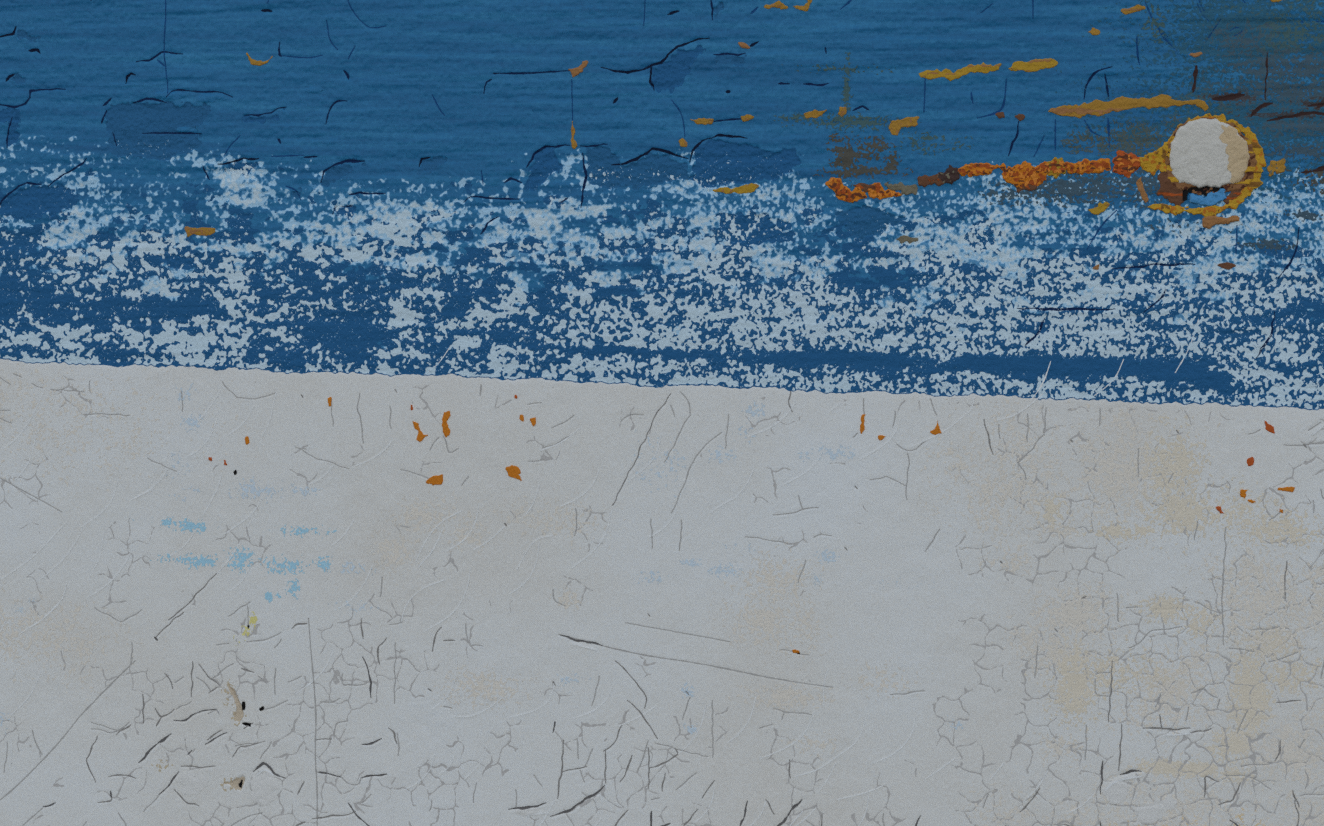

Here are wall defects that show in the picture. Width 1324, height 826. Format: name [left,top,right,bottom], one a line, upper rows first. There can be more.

crack [0,26,66,146]
crack [464,0,759,235]
peeling [918,58,1058,81]
rust [773,0,1324,235]
peeling [1048,94,1209,119]
crack [971,0,1324,157]
crack [0,158,87,205]
rust [1221,223,1317,253]
crack [0,373,129,423]
peeling [410,405,451,442]
peeling [426,474,443,485]
peeling [506,465,522,481]